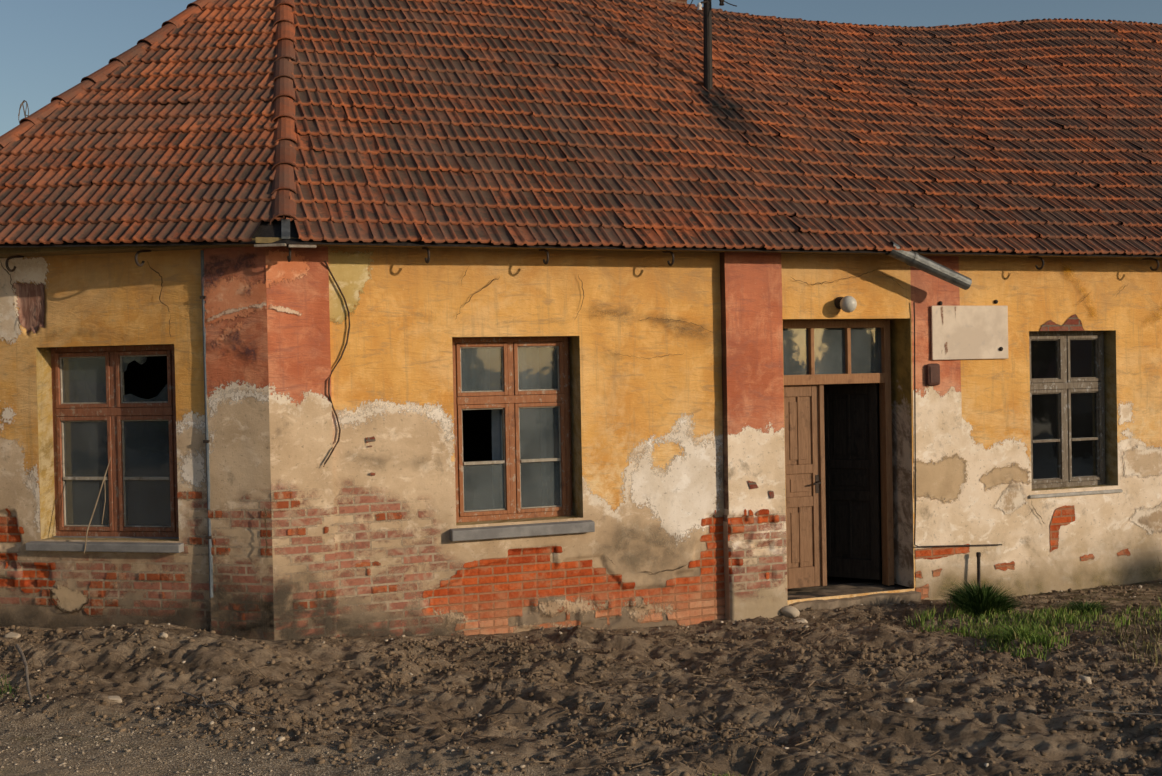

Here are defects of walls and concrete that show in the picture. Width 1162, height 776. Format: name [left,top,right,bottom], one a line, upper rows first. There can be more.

peeling [0,257,50,344]
crack [147,261,171,336]
peeling [0,379,788,641]
peeling [913,386,1162,600]
damp [142,581,416,641]